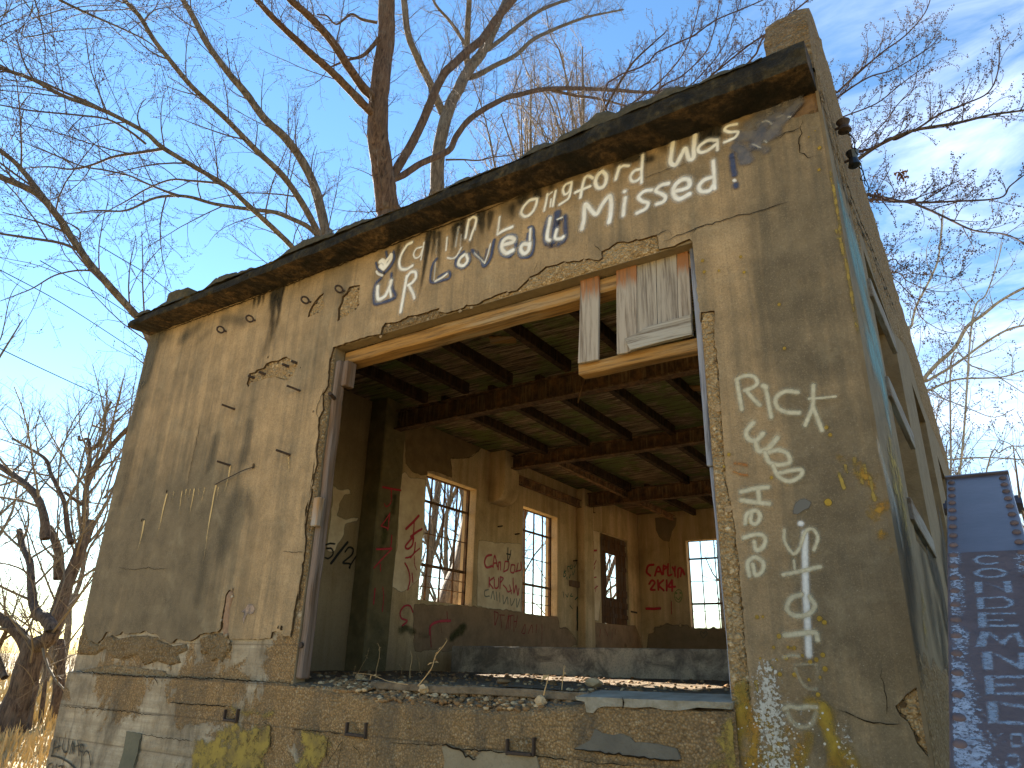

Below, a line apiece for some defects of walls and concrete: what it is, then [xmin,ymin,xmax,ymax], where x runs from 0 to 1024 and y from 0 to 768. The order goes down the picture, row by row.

crack [656,203,783,241]
crack [735,79,895,310]
damp [253,285,285,321]
spalling [247,357,297,387]
spalling [290,235,690,652]
spalling [77,590,239,668]
spalling [895,688,928,756]